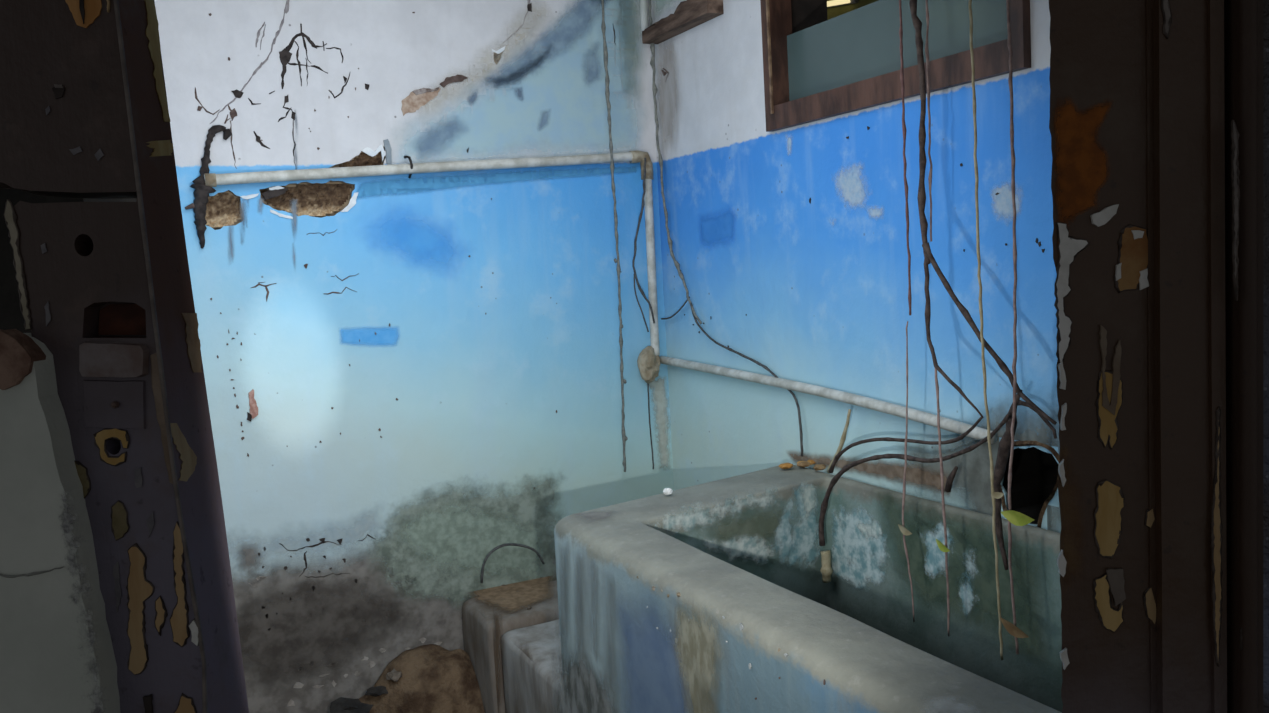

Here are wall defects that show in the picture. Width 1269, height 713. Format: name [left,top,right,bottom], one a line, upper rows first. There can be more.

flaking render [205,184,358,227]
crack [195,0,369,169]
flaking render [332,139,392,168]
peeling [401,74,468,116]
damp [408,0,638,155]
rust [1055,103,1110,222]
peeling [1035,222,1090,430]
damp [232,478,687,713]
damp [663,484,887,588]
damp [925,524,952,576]
damp [959,561,975,614]
peeling [1093,479,1126,633]